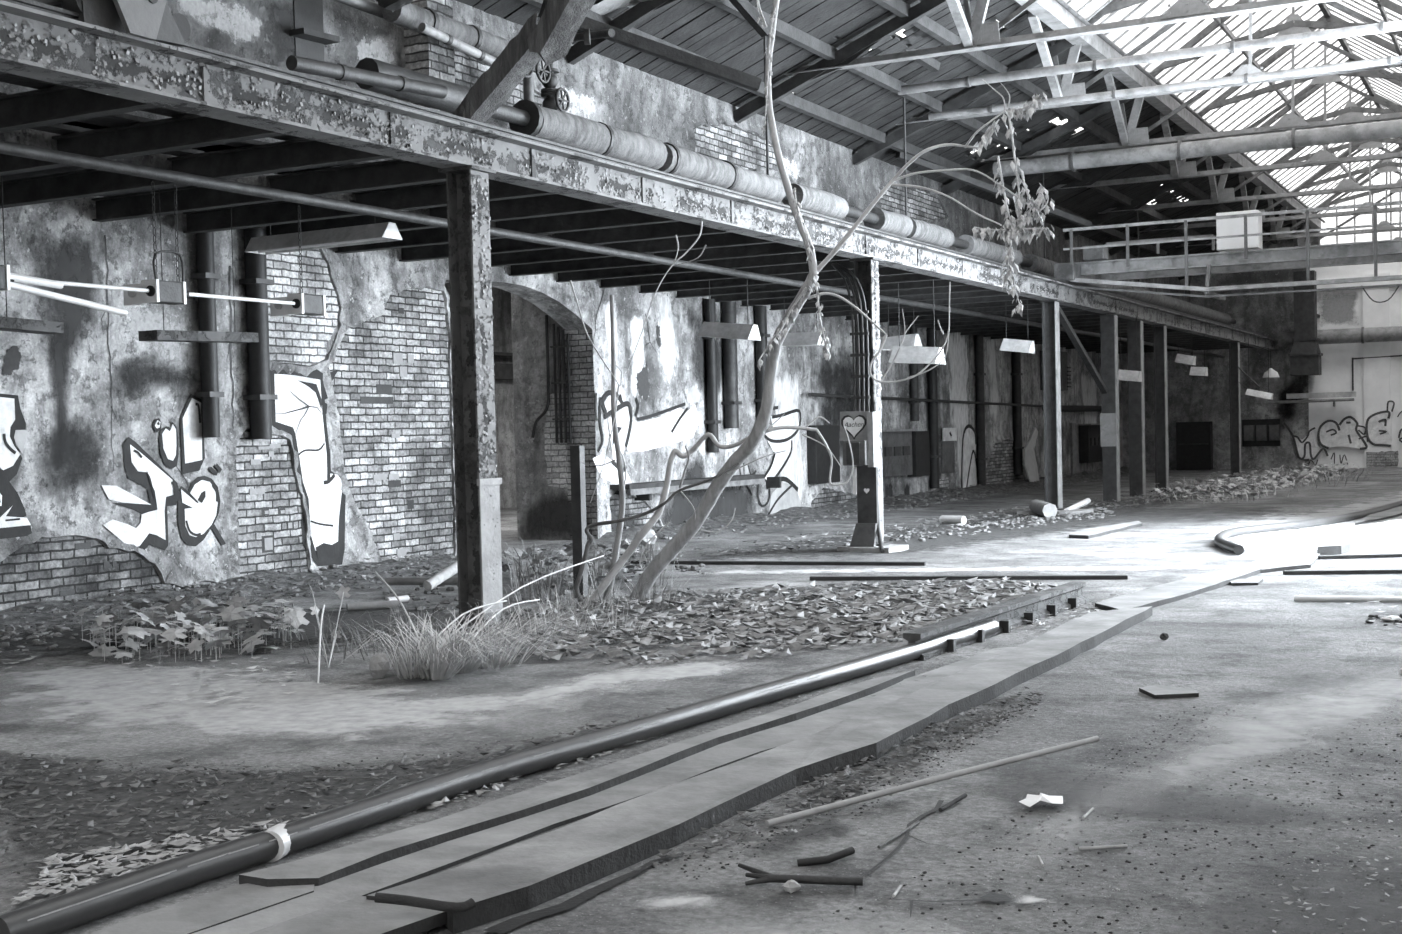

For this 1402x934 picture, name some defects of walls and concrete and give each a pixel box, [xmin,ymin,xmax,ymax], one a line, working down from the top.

peeling [0,15,205,98]
peeling [180,0,259,41]
peeling [357,26,405,68]
flaking render [454,48,491,88]
flaking render [685,113,799,179]
peeling [516,150,1064,410]
peeling [3,346,21,376]
peeling [128,307,179,360]
flaking render [223,69,595,585]
flaking render [544,328,665,540]
flaking render [986,434,1025,485]
flaking render [0,416,316,610]